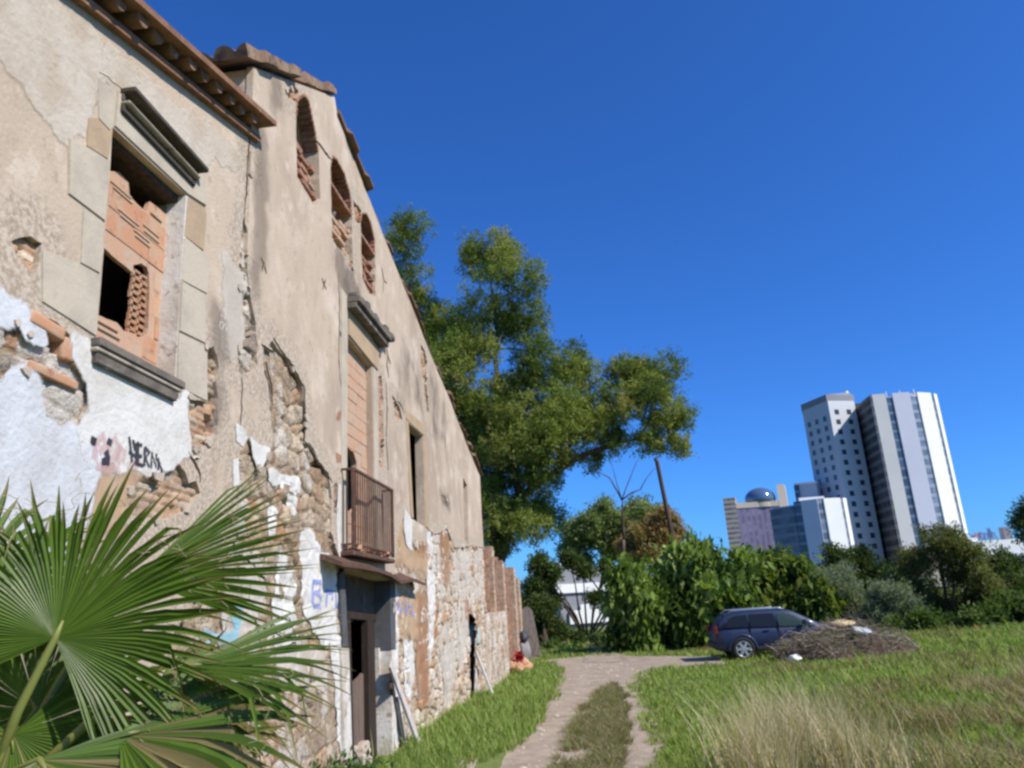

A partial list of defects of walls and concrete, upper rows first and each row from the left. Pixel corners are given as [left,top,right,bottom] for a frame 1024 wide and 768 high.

crack [243,124,251,220]
peeling [0,228,345,768]
flaking render [392,507,487,749]